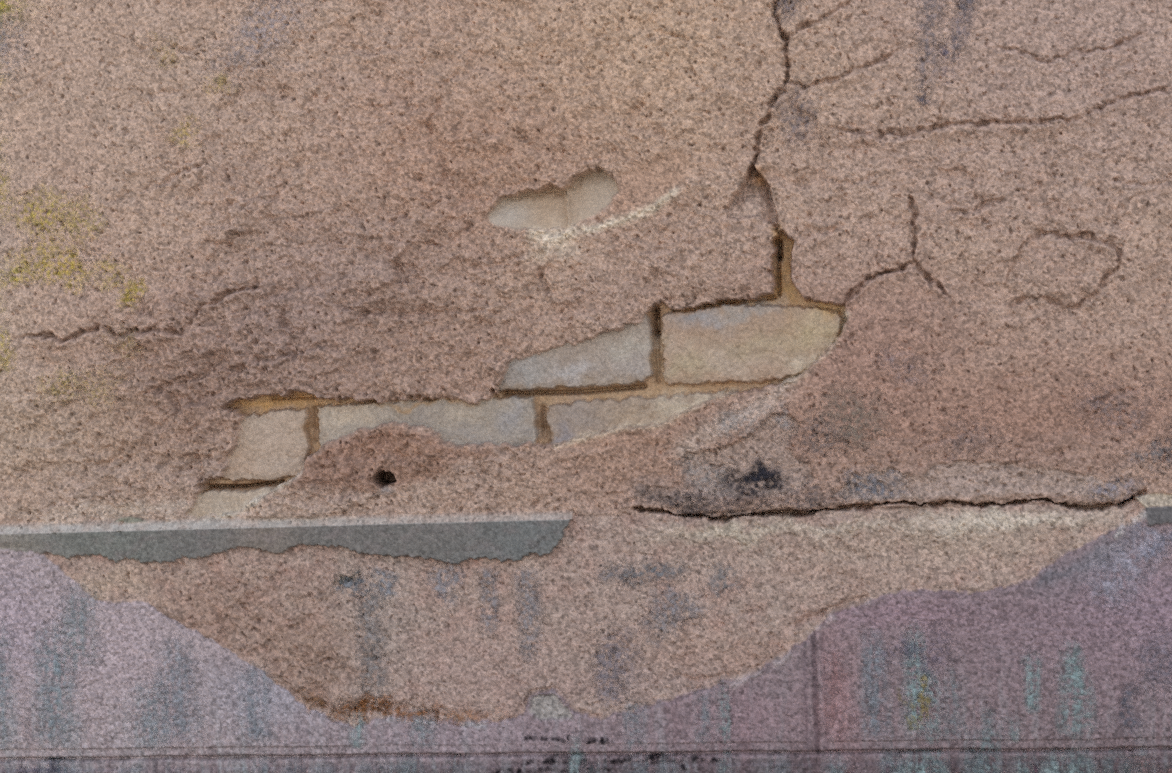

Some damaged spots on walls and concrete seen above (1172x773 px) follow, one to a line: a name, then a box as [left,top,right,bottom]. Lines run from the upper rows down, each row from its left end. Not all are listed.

crack [746,0,903,173]
crack [821,84,1172,140]
crack [989,28,1152,67]
crack [10,281,267,345]
spalling [185,167,847,518]
crack [842,189,956,309]
crack [1002,227,1125,312]
spalling [40,413,1146,730]